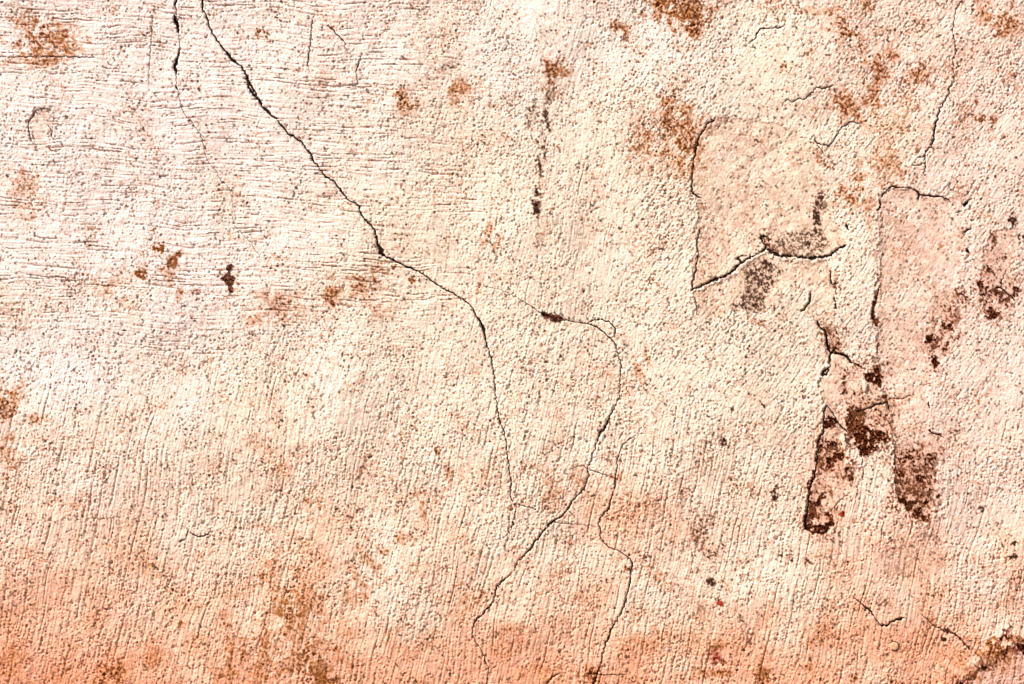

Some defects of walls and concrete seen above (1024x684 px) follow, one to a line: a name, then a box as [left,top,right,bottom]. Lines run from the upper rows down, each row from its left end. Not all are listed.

corrosion [637,0,723,40]
crack [148,0,259,255]
corrosion [628,84,709,176]
crack [691,120,714,198]
crack [781,84,834,107]
crack [814,121,860,154]
crack [876,1,972,253]
crack [202,0,641,684]
spalling [689,116,1023,541]